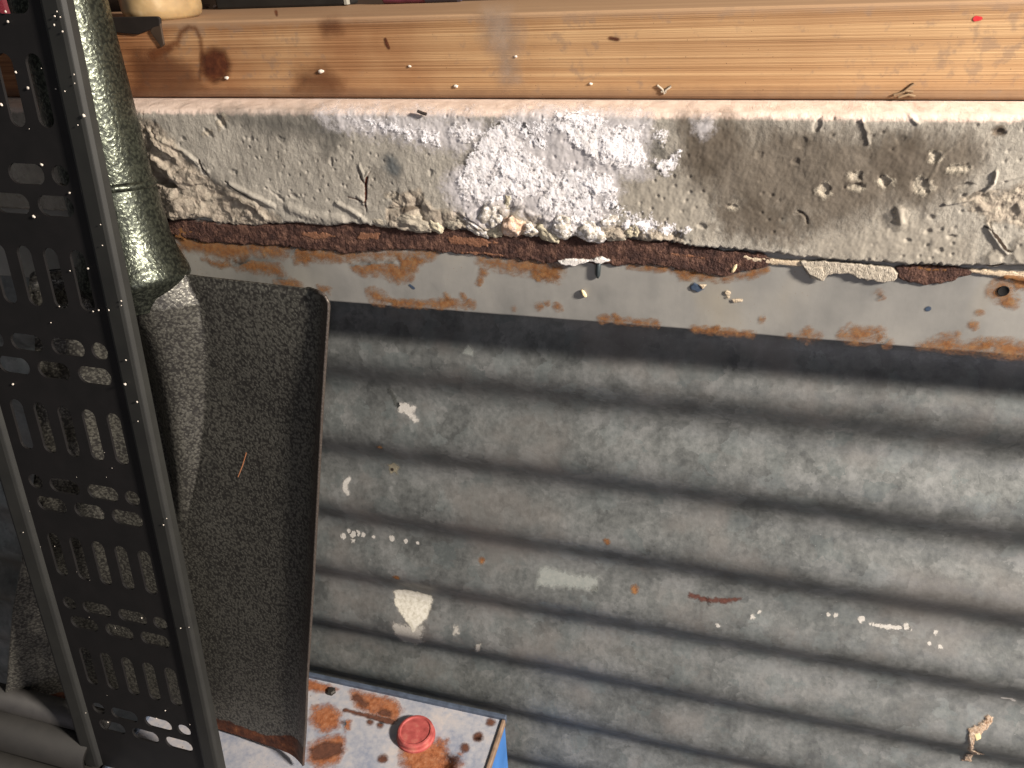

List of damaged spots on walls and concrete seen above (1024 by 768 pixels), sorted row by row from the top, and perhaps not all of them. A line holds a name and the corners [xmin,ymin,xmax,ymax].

spalling [139,120,280,226]
water stain [248,106,979,243]
spalling [385,189,554,236]
rust [167,218,770,287]
spalling [600,225,683,244]
peeling [743,255,898,283]
water stain [816,219,972,261]
rust [894,264,971,285]
rust [688,593,741,604]